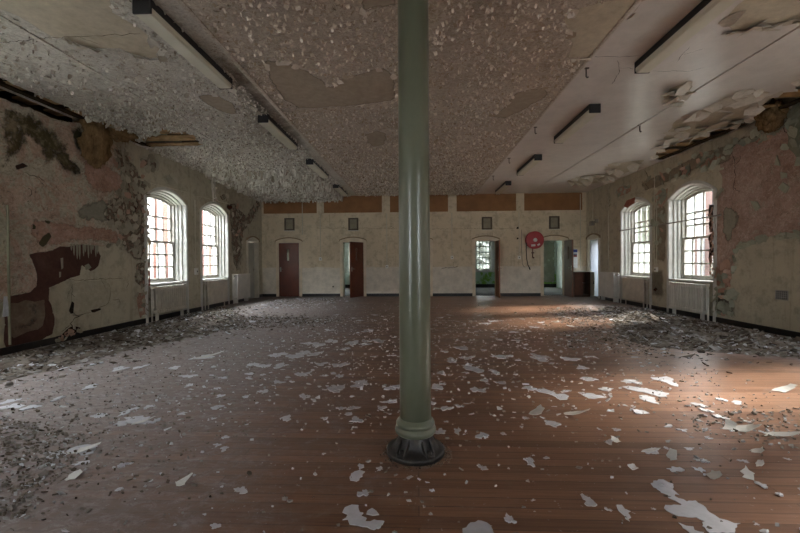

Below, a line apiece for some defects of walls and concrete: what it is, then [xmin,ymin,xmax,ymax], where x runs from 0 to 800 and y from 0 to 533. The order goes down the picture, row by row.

peeling [718,0,800,38]
damp [2,109,82,174]
flaking render [0,0,399,347]
peeling [428,0,587,195]
peeling [567,160,644,186]
peeling [653,81,773,149]
flaking render [642,97,800,317]